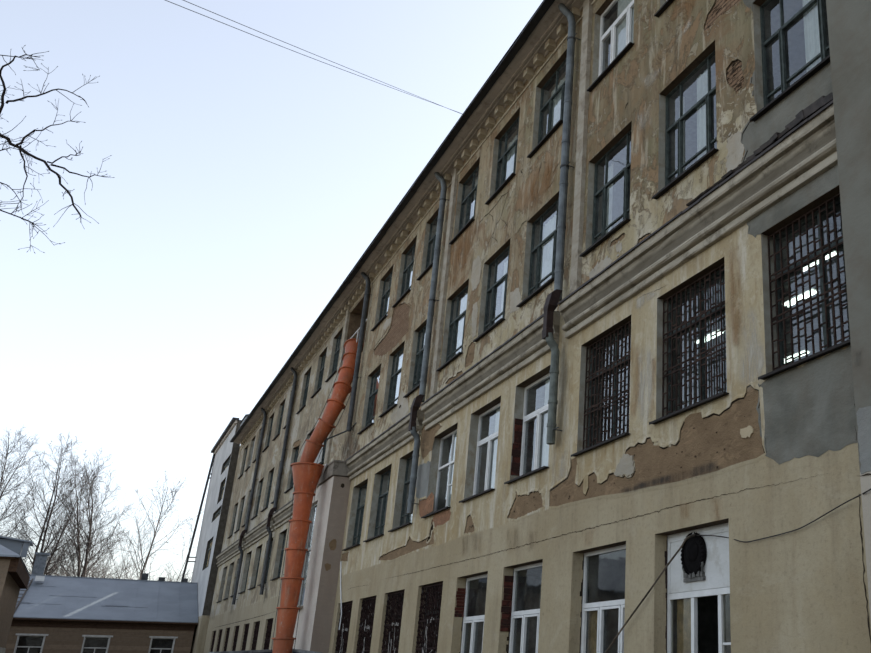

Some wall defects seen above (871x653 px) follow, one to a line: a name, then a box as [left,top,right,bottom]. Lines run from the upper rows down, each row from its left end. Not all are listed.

flaking render [703,0,743,36]
flaking render [724,55,749,99]
peeling [726,131,744,172]
flaking render [374,301,411,359]
flaking render [506,381,766,523]
flaking render [379,492,452,563]